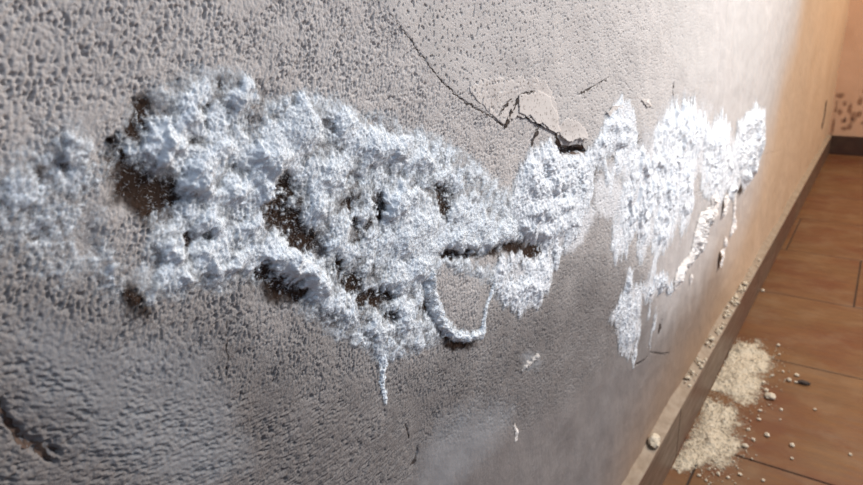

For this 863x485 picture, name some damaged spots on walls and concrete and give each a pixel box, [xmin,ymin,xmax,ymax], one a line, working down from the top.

crack [389,13,547,148]
peeling [469,76,588,157]
water stain [0,54,766,404]